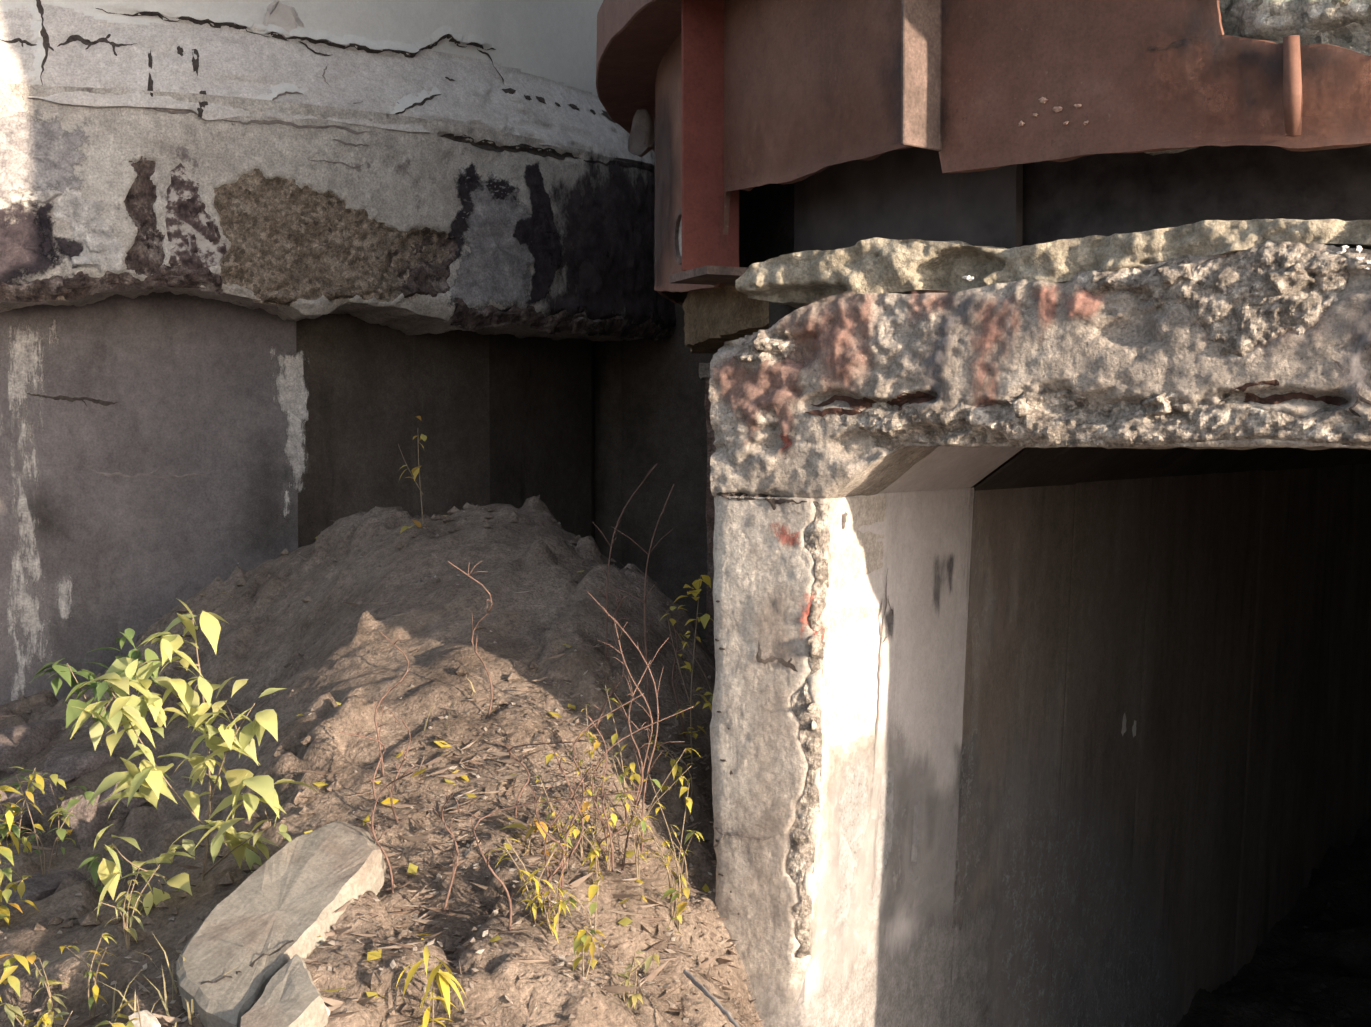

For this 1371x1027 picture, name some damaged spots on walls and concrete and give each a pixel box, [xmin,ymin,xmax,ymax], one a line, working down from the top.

crack [0,0,137,85]
spalling [1219,0,1371,56]
rust [1018,97,1089,127]
spalling [0,109,675,340]
spalling [1076,240,1350,357]
spalling [841,387,1371,452]
water stain [0,320,72,701]
spalling [786,501,848,959]